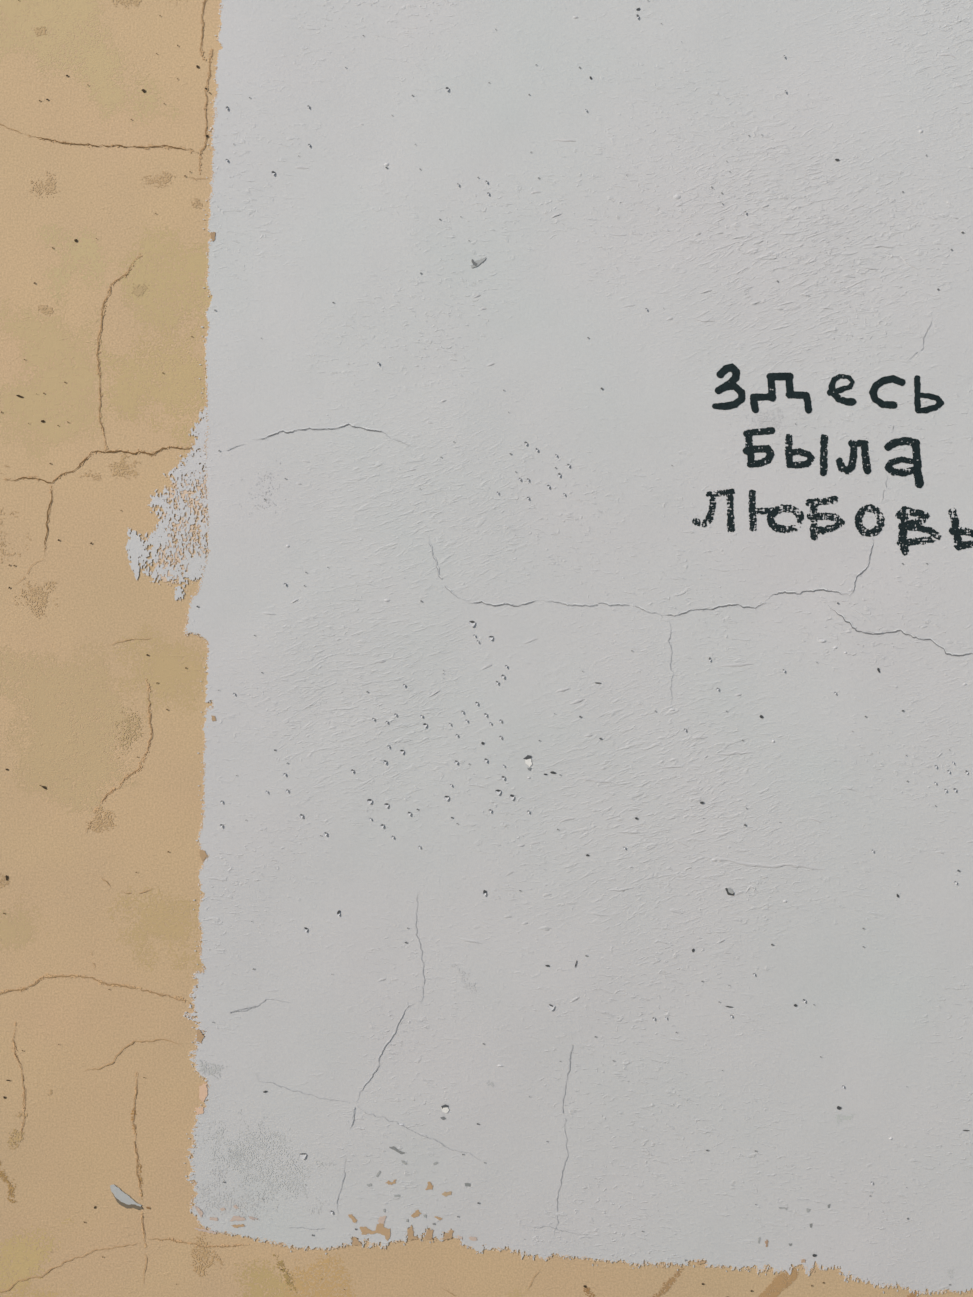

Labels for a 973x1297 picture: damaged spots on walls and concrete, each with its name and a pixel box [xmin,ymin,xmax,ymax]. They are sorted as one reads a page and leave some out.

crack [0,0,213,180]
crack [4,253,192,580]
crack [226,423,407,451]
crack [428,534,973,705]
crack [86,679,152,830]
crack [0,953,190,1139]
crack [0,1039,249,1293]
peeling [330,1171,400,1246]
water stain [759,1268,798,1297]